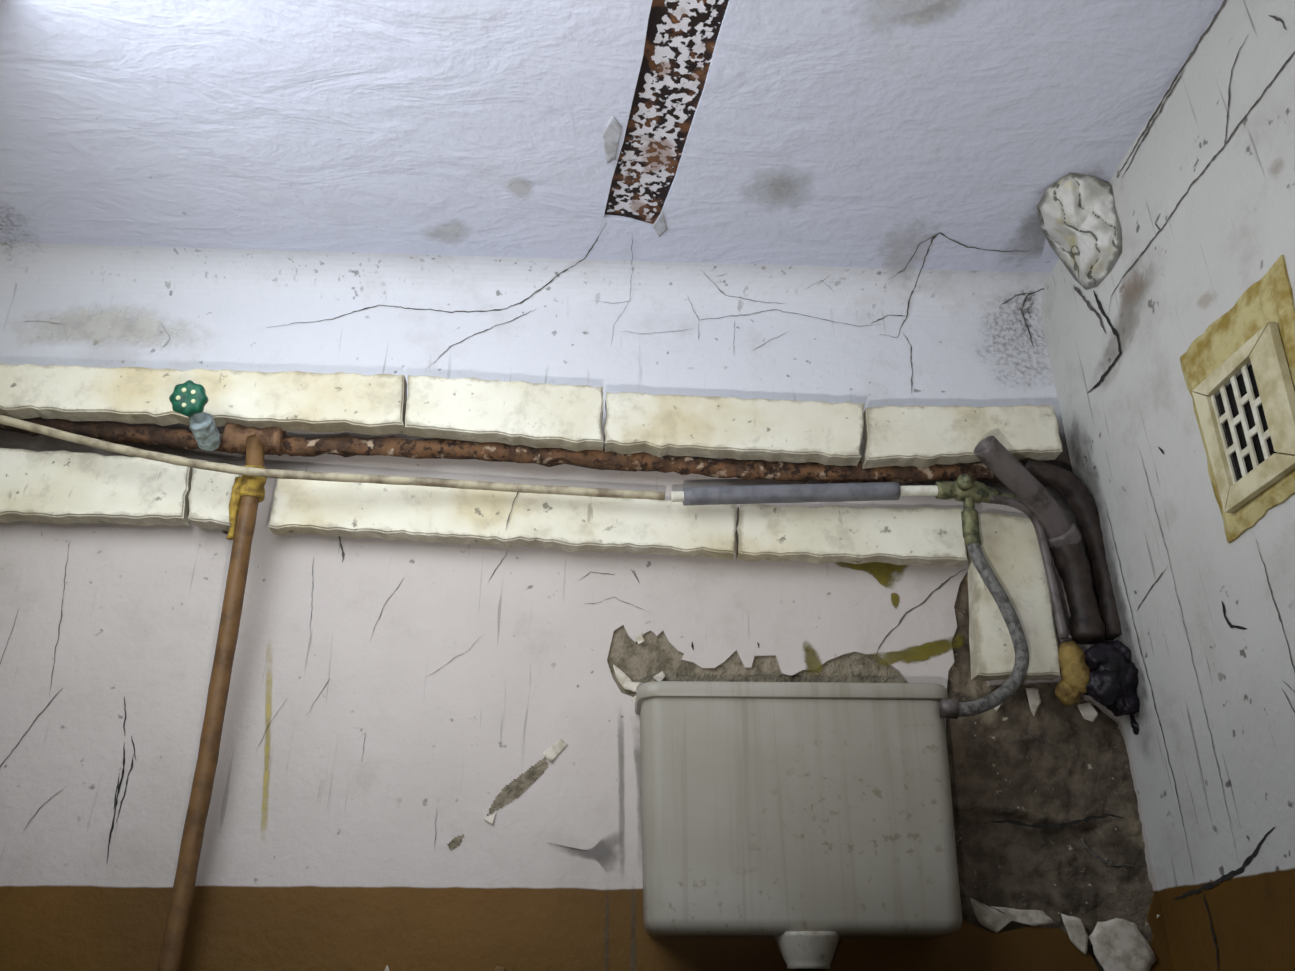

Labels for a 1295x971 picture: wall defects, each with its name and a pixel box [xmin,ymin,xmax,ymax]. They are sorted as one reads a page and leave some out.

crack [267,222,1023,391]
spalling [602,0,729,237]
crack [999,0,1295,393]
flaking render [607,626,908,703]
flaking render [946,571,1160,971]